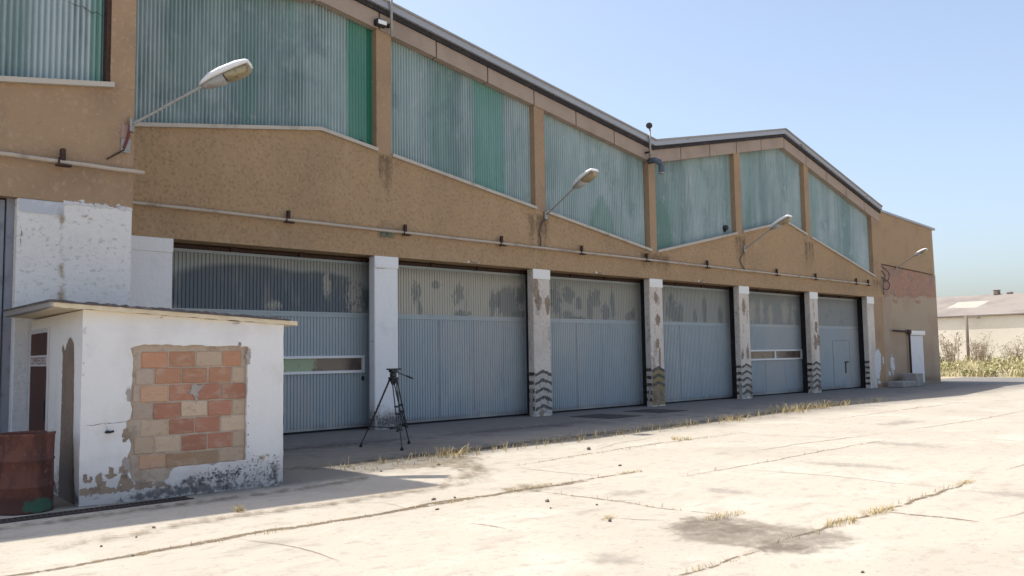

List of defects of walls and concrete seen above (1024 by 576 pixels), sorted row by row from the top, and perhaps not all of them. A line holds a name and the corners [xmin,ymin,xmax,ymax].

flaking render [532,279,551,315]
flaking render [883,266,936,304]
flaking render [58,338,168,505]